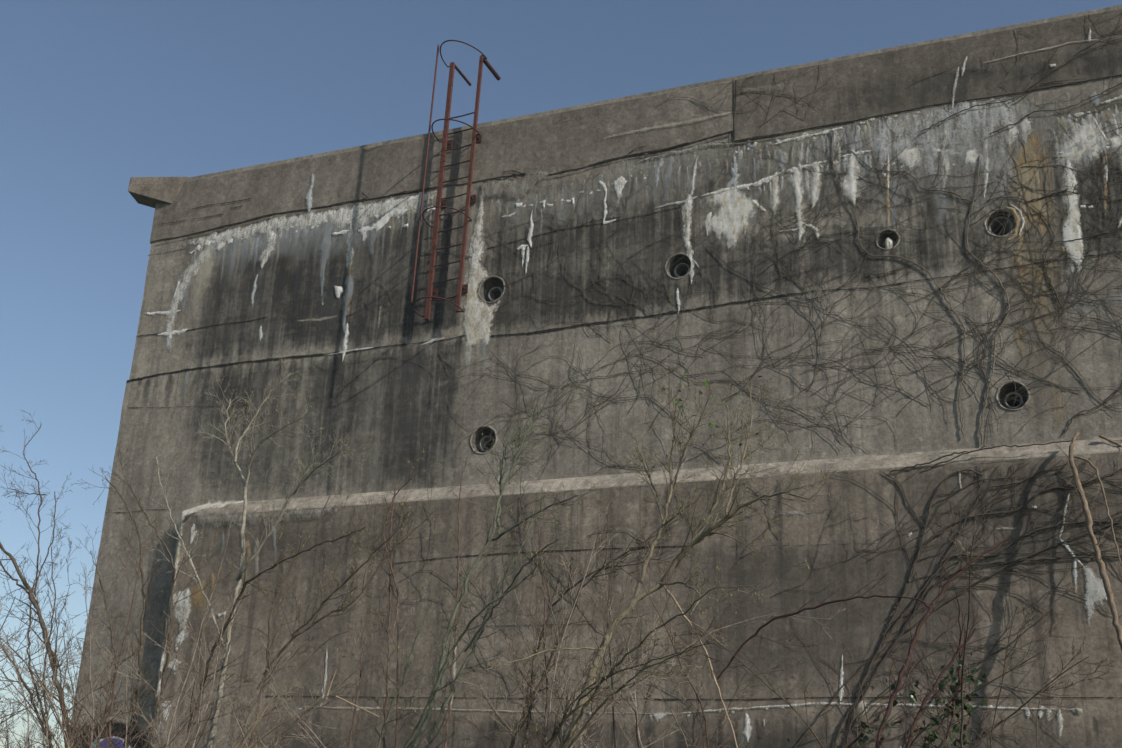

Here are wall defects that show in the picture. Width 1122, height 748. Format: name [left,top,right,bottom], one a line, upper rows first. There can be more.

leakage [145,56,1122,471]